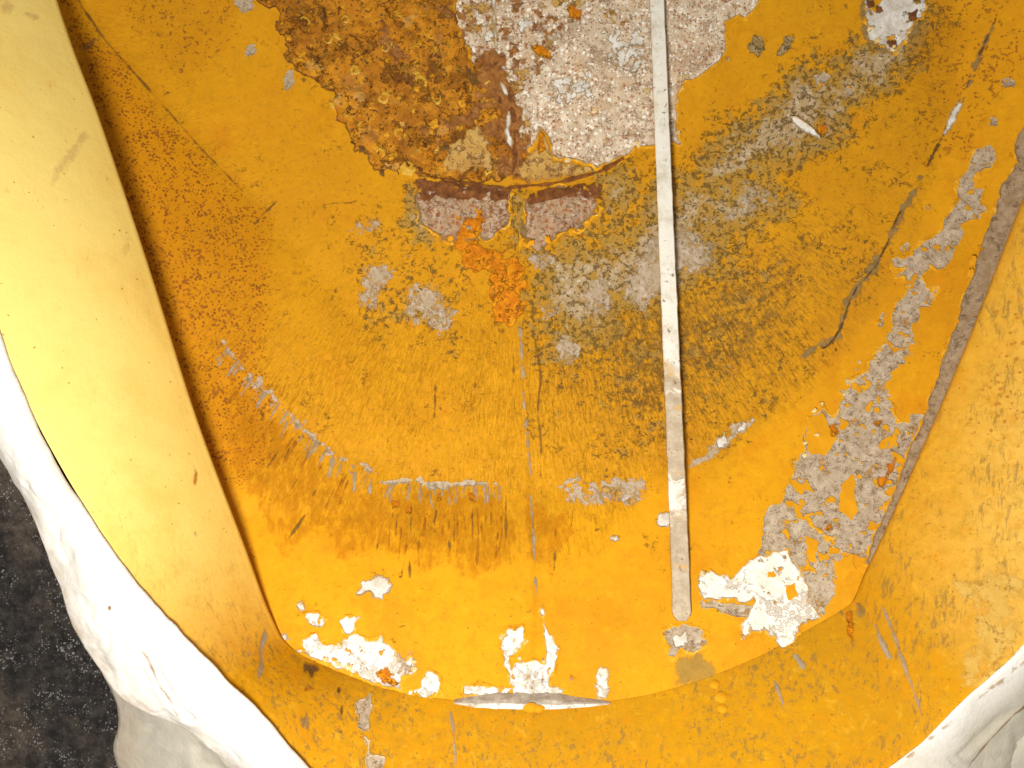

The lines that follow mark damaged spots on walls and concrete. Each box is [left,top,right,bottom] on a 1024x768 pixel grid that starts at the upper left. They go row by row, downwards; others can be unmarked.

rust [378,22,414,66]
rust [421,0,591,185]
peeling [454,0,655,171]
peeling [664,0,763,147]
peeling [860,0,928,56]
rust [453,207,528,331]
peeling [413,168,603,271]
crack [801,18,996,358]
peeling [217,339,501,514]
peeling [689,127,1024,648]
peeling [281,600,575,699]
peeling [593,666,609,700]